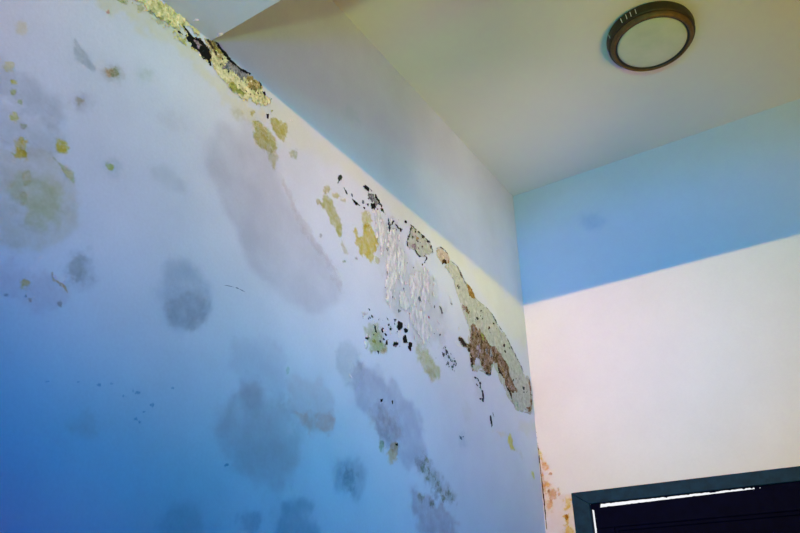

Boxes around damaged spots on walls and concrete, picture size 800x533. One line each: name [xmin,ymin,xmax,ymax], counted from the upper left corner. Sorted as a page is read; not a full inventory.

flaking render [124,0,273,119]
flaking render [338,175,533,415]